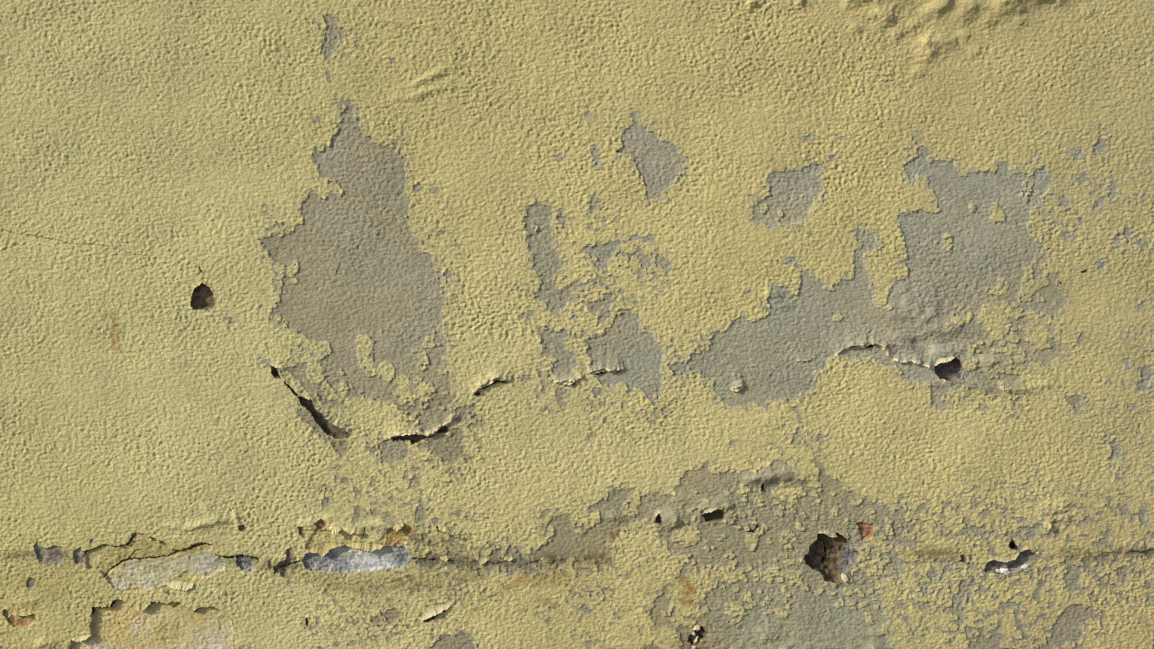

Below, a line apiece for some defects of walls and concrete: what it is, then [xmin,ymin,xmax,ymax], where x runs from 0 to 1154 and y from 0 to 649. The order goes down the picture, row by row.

peeling [235,9,1154,649]
crack [270,364,351,439]
crack [473,378,510,396]
crack [391,424,449,445]
crack [411,526,503,564]
crack [817,537,827,565]
flaking render [26,577,37,591]
peeling [33,533,235,649]